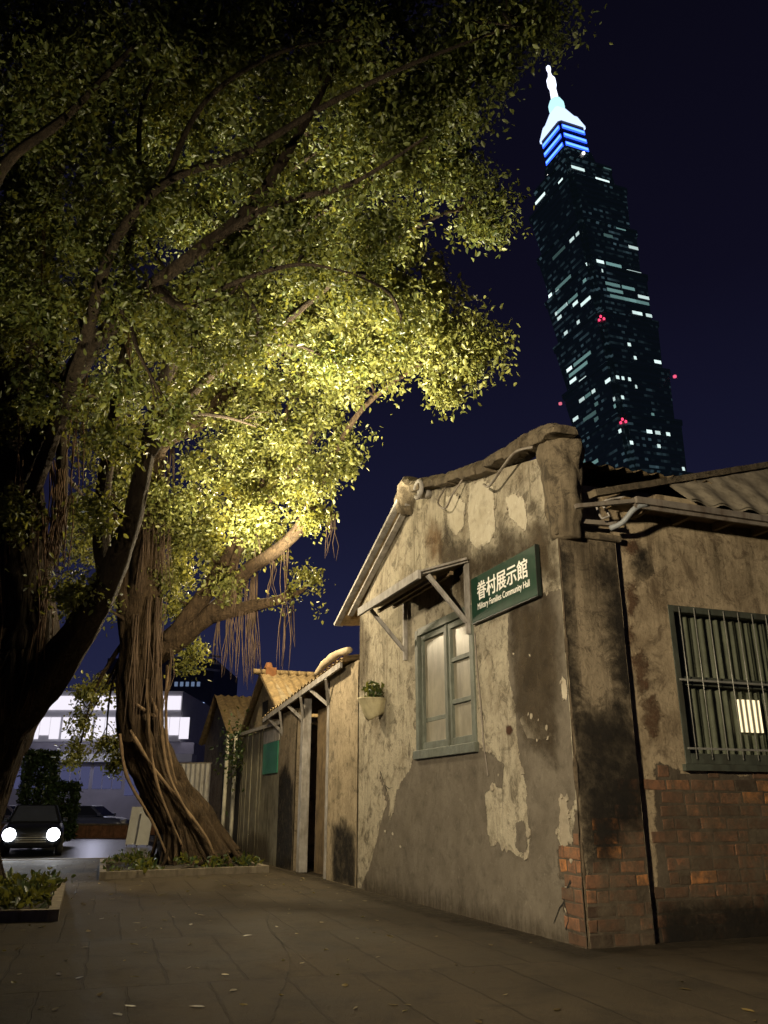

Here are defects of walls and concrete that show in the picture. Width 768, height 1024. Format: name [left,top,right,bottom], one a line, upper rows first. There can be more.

flaking render [446,477,528,550]
water stain [332,820,491,923]
water stain [441,522,642,858]
flaking render [361,584,768,949]